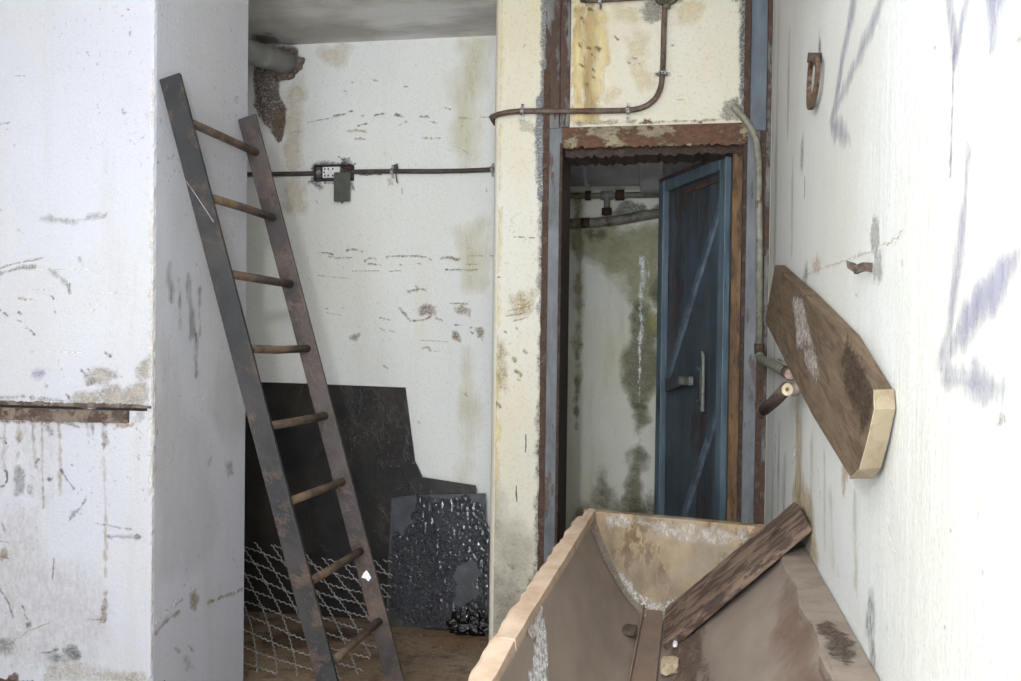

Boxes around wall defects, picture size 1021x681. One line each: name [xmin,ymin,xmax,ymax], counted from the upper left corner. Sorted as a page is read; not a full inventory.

spalling [253,66,286,142]
crack [806,230,903,276]
water stain [572,199,658,428]
water stain [625,445,647,509]